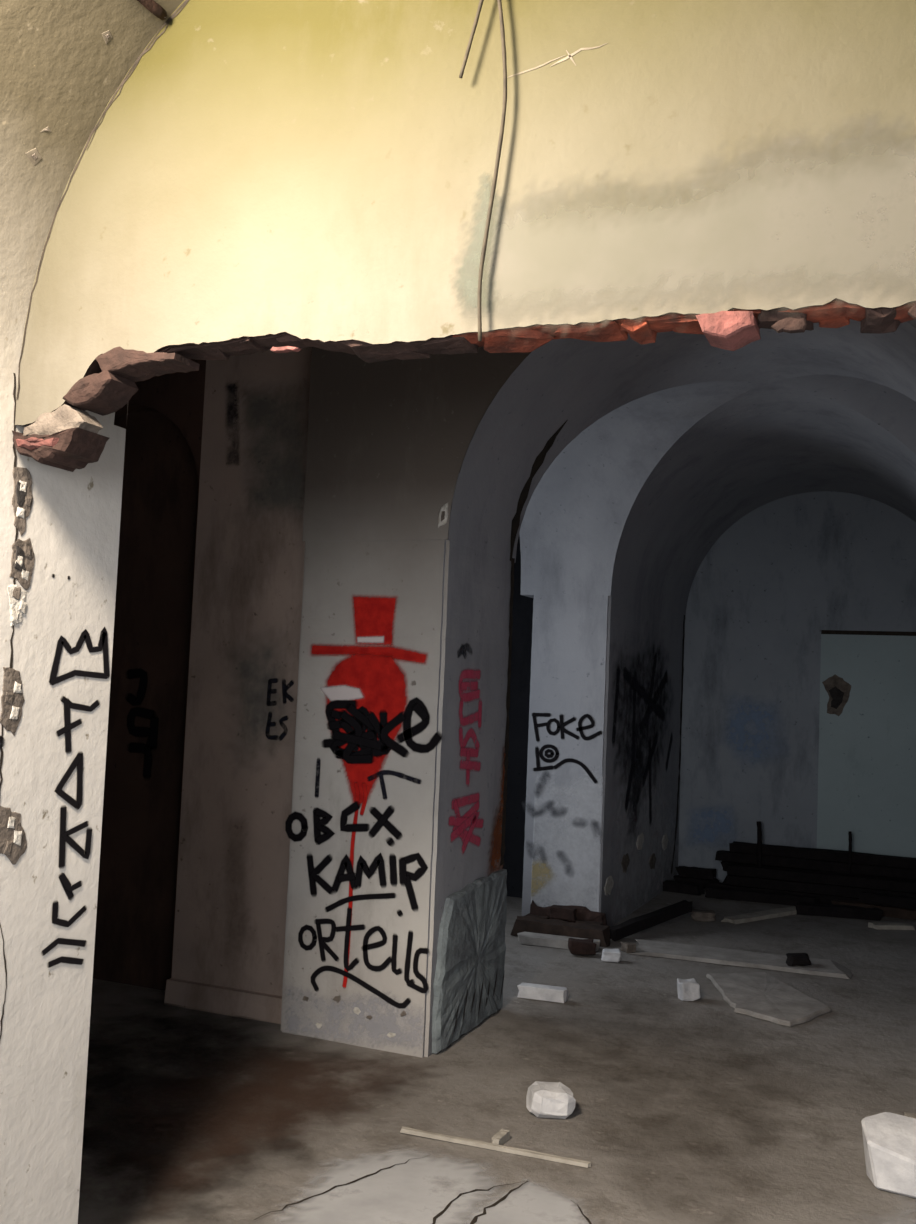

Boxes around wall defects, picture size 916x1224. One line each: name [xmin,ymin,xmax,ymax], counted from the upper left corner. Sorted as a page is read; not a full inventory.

water stain [457,129,916,315]
flaking render [7,299,916,626]
flaking render [0,667,25,736]
flaking render [822,674,851,716]
crack [254,1156,426,1220]
crack [432,1181,528,1224]